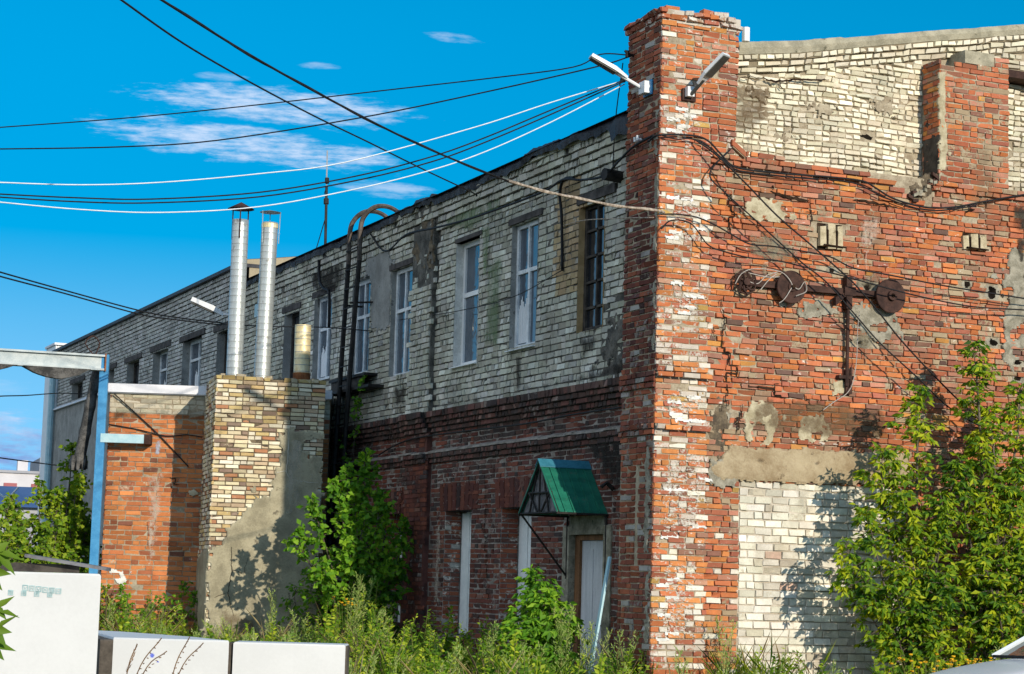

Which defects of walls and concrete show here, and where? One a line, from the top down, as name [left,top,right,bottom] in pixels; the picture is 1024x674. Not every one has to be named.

spalling [746,84,777,105]
spalling [804,101,841,122]
spalling [870,97,901,119]
spalling [773,130,803,149]
crack [726,190,738,240]
damp [670,281,705,315]
damp [667,390,705,423]
spalling [706,396,732,459]
damp [660,454,713,539]
damp [655,564,696,641]